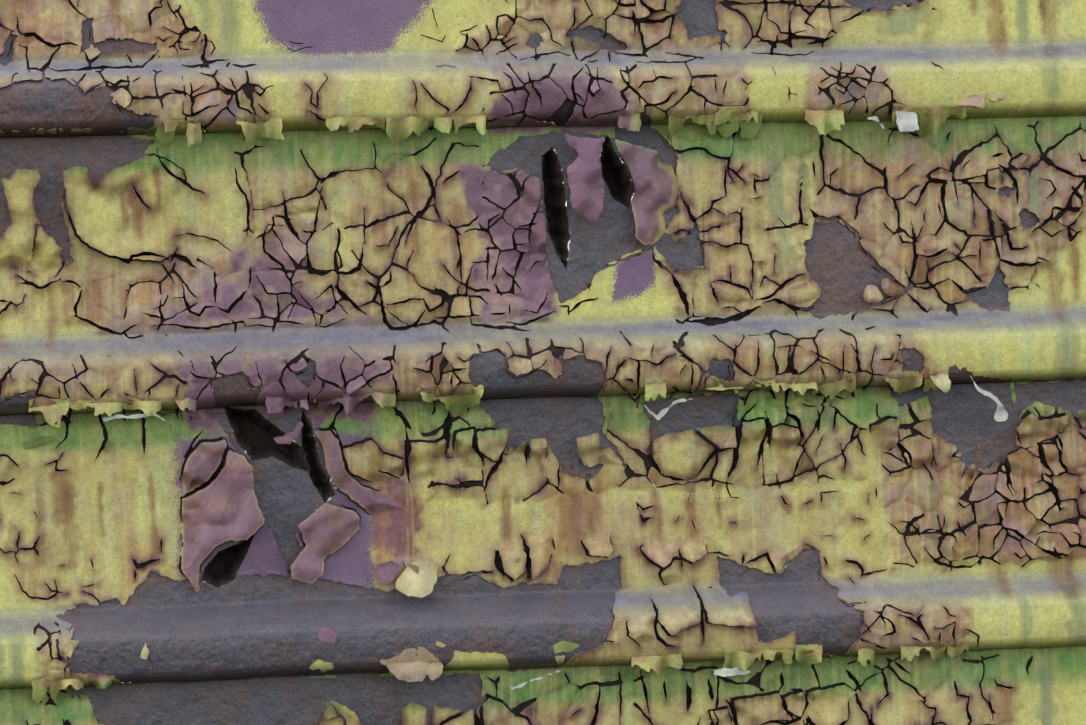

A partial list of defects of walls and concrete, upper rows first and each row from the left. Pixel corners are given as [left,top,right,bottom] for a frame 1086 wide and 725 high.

crack [0,0,273,119]
crack [413,0,923,130]
peeling [758,0,932,55]
crack [157,149,205,194]
peeling [0,0,780,342]
peeling [609,53,1086,327]
crack [0,165,894,528]
crack [0,478,111,607]
crack [442,535,555,581]
peeling [0,323,1086,725]
crack [708,551,775,573]
crack [897,433,1086,569]